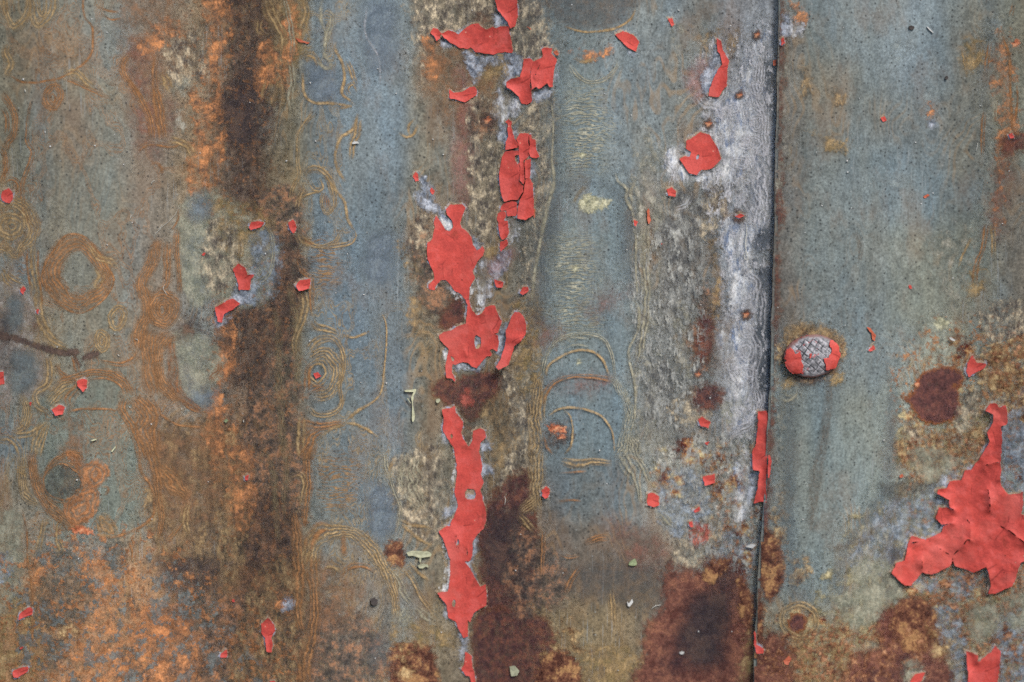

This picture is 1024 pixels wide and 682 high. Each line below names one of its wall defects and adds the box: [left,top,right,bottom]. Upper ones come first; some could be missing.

rust [175,0,233,196]
rust [256,0,310,103]
peeling [505,46,559,105]
peeling [679,118,722,175]
peeling [707,37,743,99]
peeling [425,202,527,382]
rust [432,3,1024,682]
rust [0,185,453,682]
peeling [435,405,488,638]
peeling [750,409,772,504]
peeling [889,401,1024,594]
peeling [963,643,1002,682]